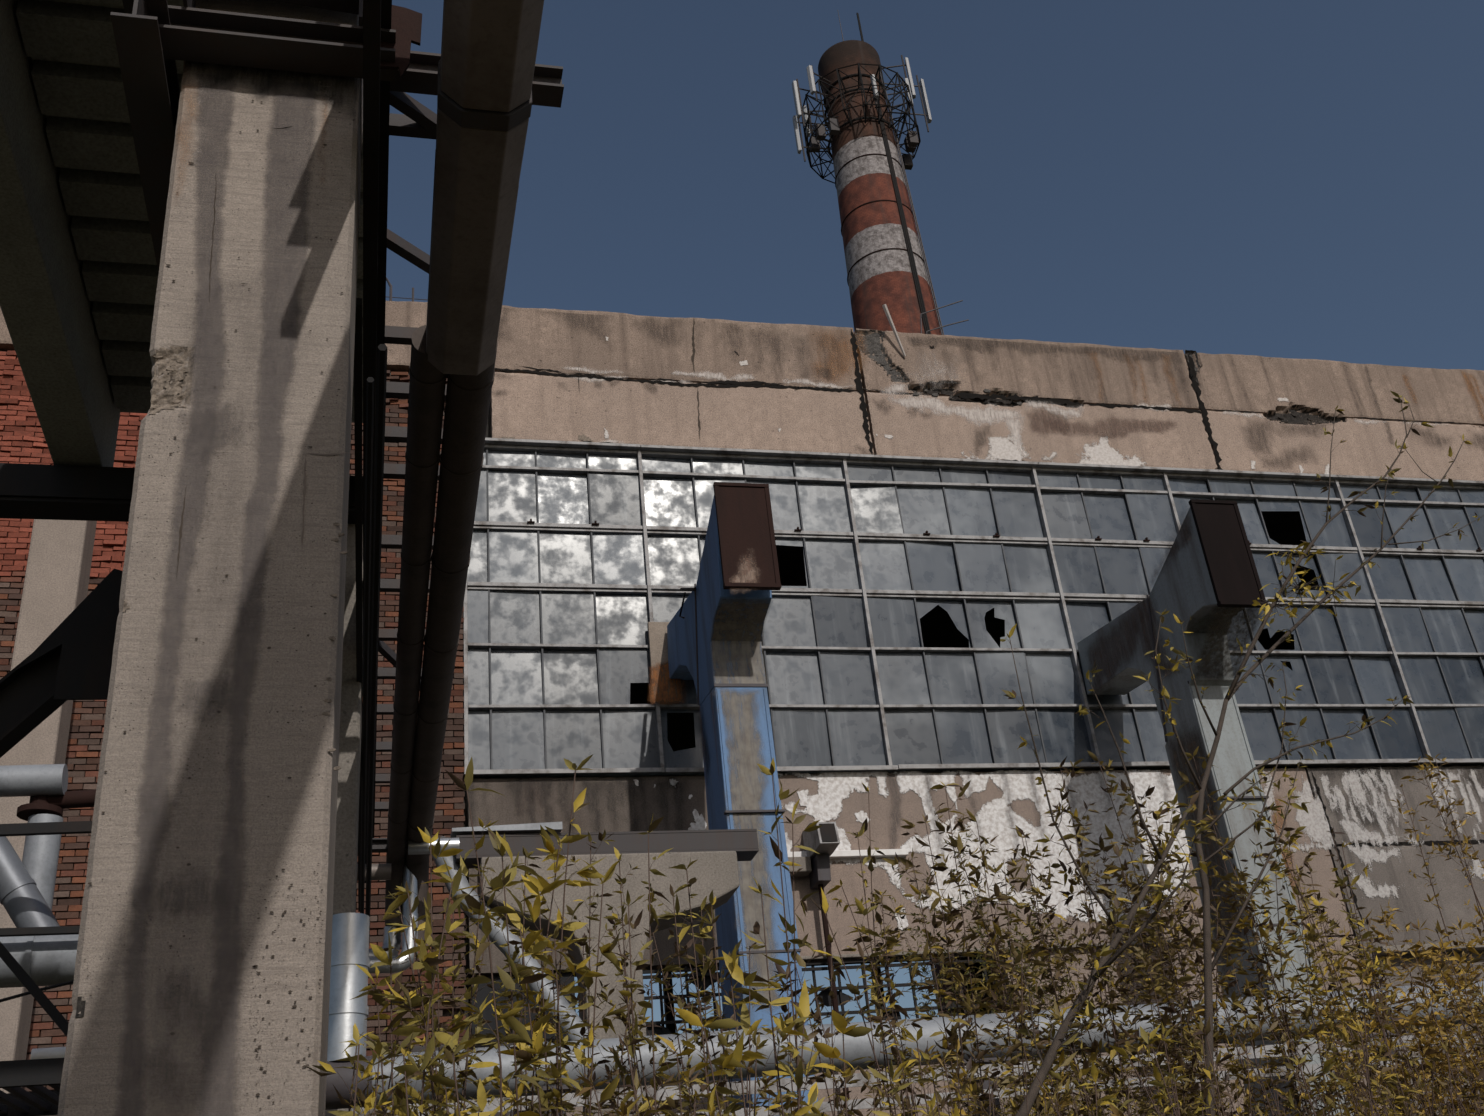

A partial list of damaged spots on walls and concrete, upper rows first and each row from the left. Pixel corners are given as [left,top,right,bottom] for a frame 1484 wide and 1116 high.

spalling [149,346,195,414]
crack [494,319,1262,470]
spalling [854,330,1084,408]
spalling [1264,405,1346,425]
crack [1348,416,1462,424]
water stain [121,61,355,1116]
peeling [778,769,1191,930]
peeling [1262,767,1425,900]
peeling [1423,765,1484,881]